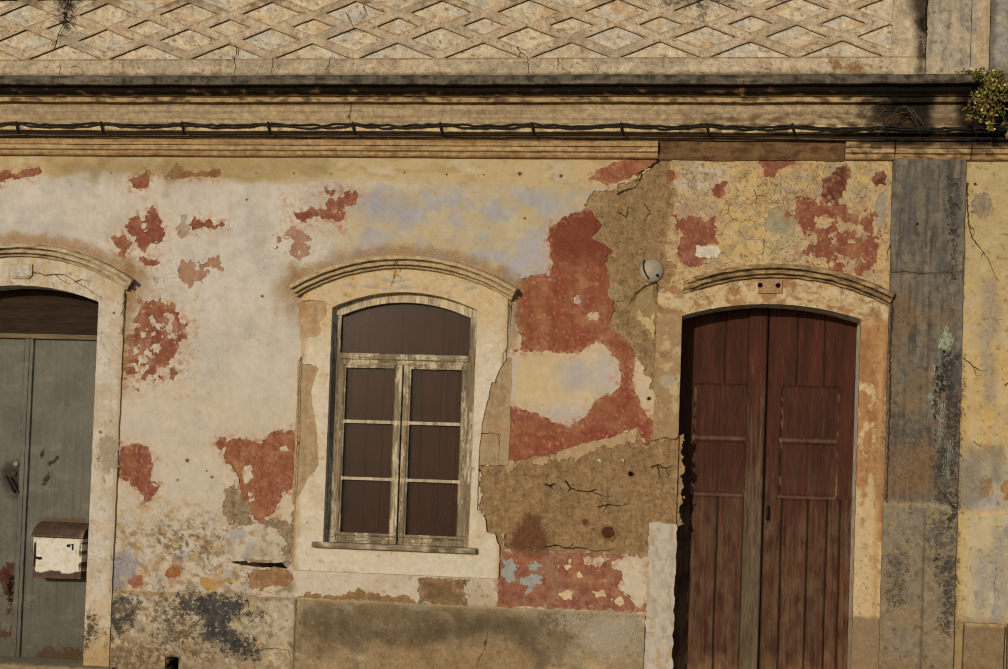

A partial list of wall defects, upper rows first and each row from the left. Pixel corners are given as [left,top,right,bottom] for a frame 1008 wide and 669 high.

peeling [111,203,225,266]
crack [720,181,824,255]
water stain [944,175,963,285]
crack [966,182,998,280]
peeling [122,297,188,392]
flaking render [478,159,719,613]
peeling [200,359,319,592]
crack [545,480,625,510]
water stain [877,348,982,637]
crack [546,543,614,552]
water stain [79,608,98,653]
water stain [109,556,267,669]